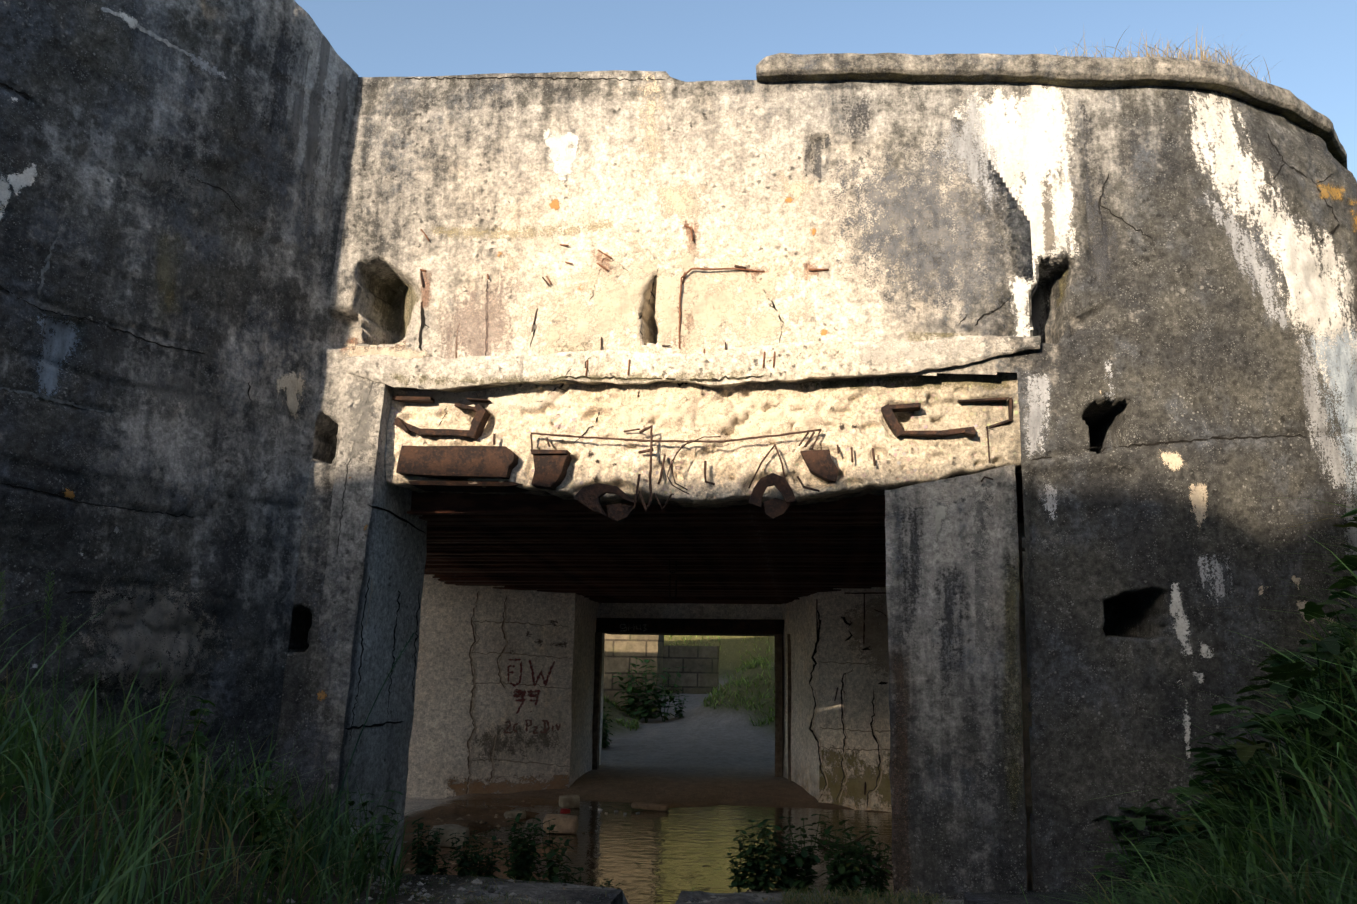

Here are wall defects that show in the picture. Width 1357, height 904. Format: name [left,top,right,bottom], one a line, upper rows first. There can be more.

peeling [5,163,37,195]
crack [0,285,205,354]
spalling [520,74,857,512]
damp [804,83,1119,365]
damp [1186,88,1357,555]
damp [1197,554,1234,606]
crack [809,609,888,806]